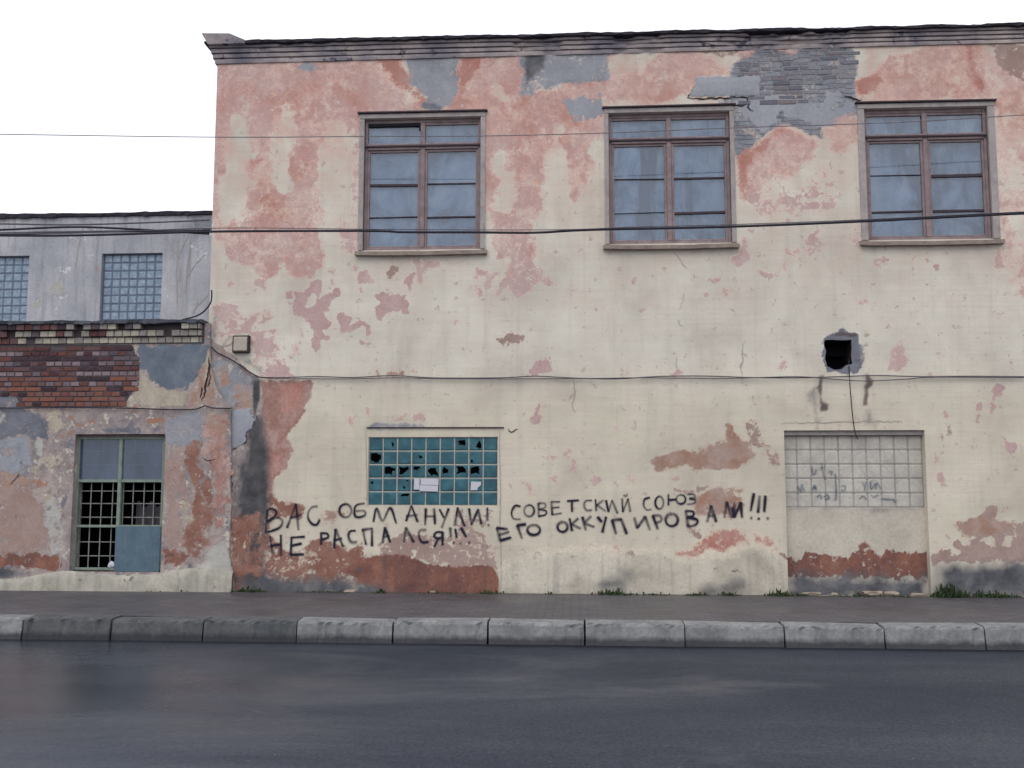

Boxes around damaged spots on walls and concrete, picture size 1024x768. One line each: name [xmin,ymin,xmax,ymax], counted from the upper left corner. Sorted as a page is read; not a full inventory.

peeling [192,43,1024,353]
crack [200,338,233,401]
flaking render [822,328,869,376]
spalling [0,302,500,593]
water stain [238,381,379,592]
peeling [651,422,780,472]
peeling [674,486,1024,582]
water stain [943,563,1024,597]